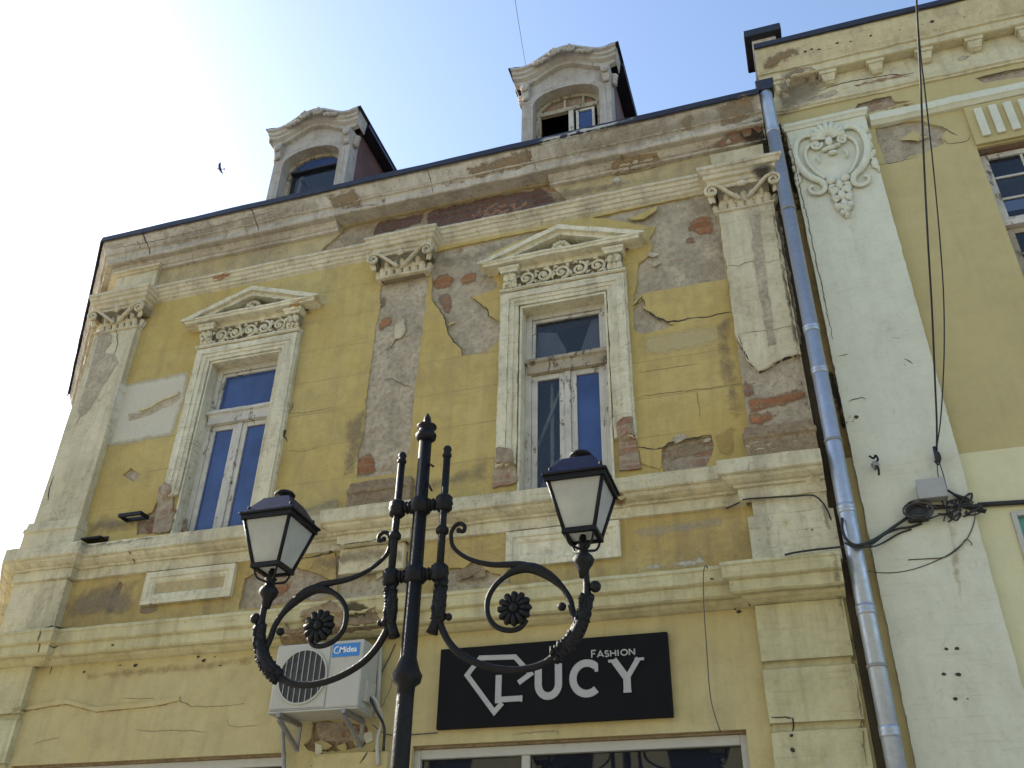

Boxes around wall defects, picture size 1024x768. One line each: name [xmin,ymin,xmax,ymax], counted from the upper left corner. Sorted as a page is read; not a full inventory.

spalling [876,122,945,163]
crack [113,205,279,262]
spalling [324,185,566,251]
spalling [600,195,726,334]
peeling [77,330,186,445]
spalling [346,231,542,478]
crack [632,296,797,373]
spalling [720,206,813,427]
spalling [662,429,734,472]
spalling [138,482,189,535]
crack [2,698,258,732]
spalling [305,721,373,752]